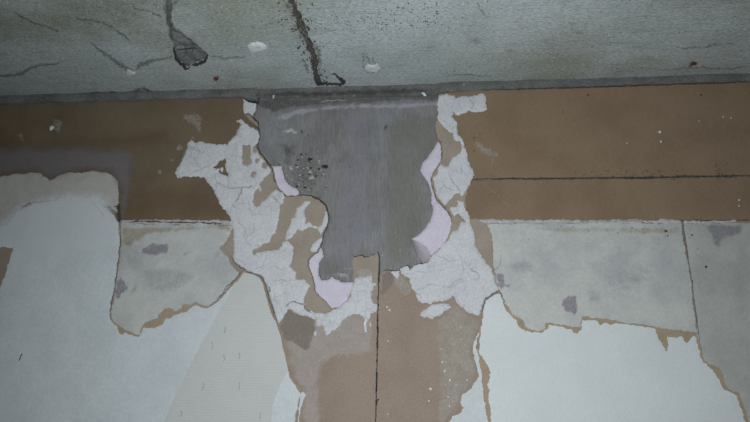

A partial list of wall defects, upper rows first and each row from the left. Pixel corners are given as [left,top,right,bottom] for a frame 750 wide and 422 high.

crack [91,42,172,76]
crack [277,0,346,87]
flaking render [175,99,378,336]
flaking render [391,93,499,319]